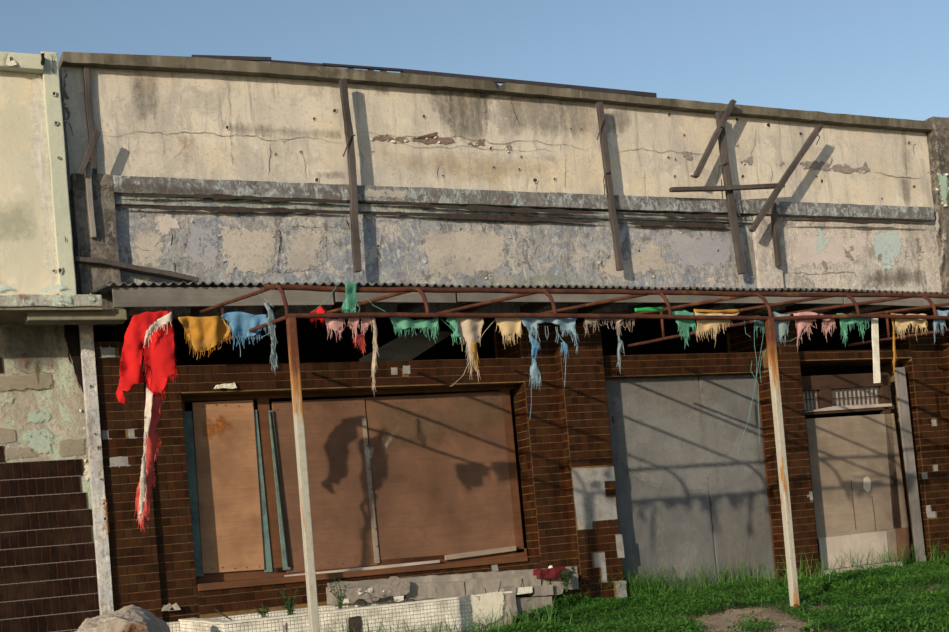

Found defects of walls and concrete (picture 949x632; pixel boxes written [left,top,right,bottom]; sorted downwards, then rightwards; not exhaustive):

crack [103,83,336,171]
spalling [370,132,454,145]
crack [358,80,718,188]
spalling [800,160,871,184]
peeling [133,214,327,276]
peeling [424,227,513,279]
peeling [595,226,757,284]
peeling [935,173,949,268]
spalling [64,325,93,393]
peeling [572,467,618,530]
peeling [594,552,627,598]
peeling [616,534,625,558]